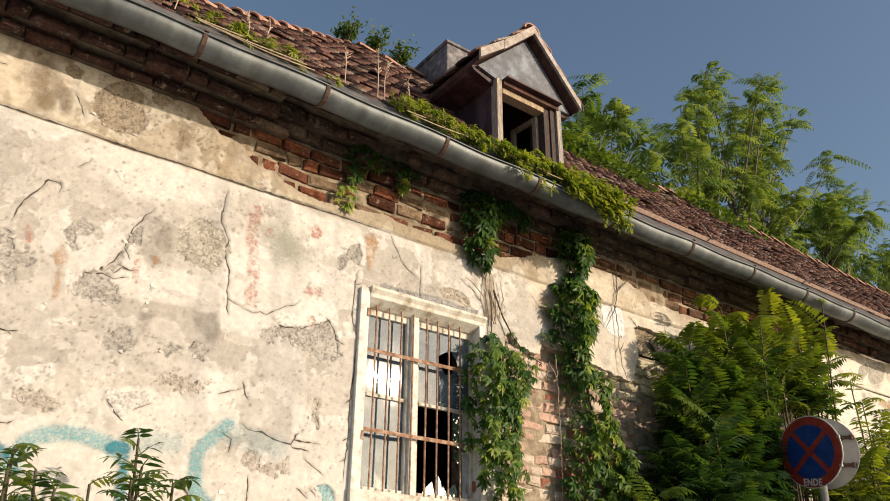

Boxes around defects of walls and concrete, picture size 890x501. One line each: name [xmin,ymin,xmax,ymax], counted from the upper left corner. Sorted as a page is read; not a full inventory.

spalling [91,81,175,137]
spalling [0,227,37,286]
spalling [72,225,143,306]
spalling [175,217,231,272]
crack [0,96,421,479]
spalling [337,244,364,270]
spalling [259,317,342,361]
crack [222,404,322,498]